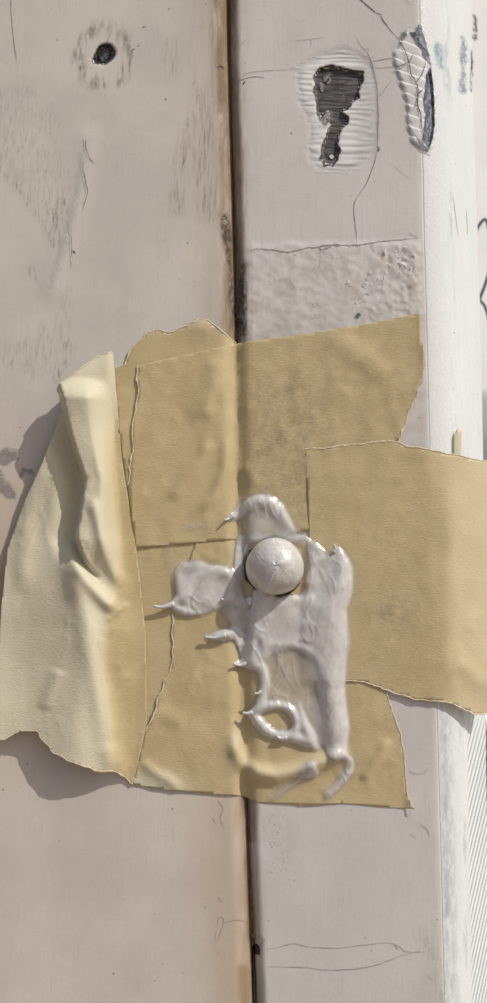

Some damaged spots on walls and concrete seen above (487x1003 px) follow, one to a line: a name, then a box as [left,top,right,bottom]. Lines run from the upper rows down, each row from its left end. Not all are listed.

spalling [92,43,115,65]
spalling [297,49,369,172]
crack [347,0,398,243]
spalling [393,24,437,155]